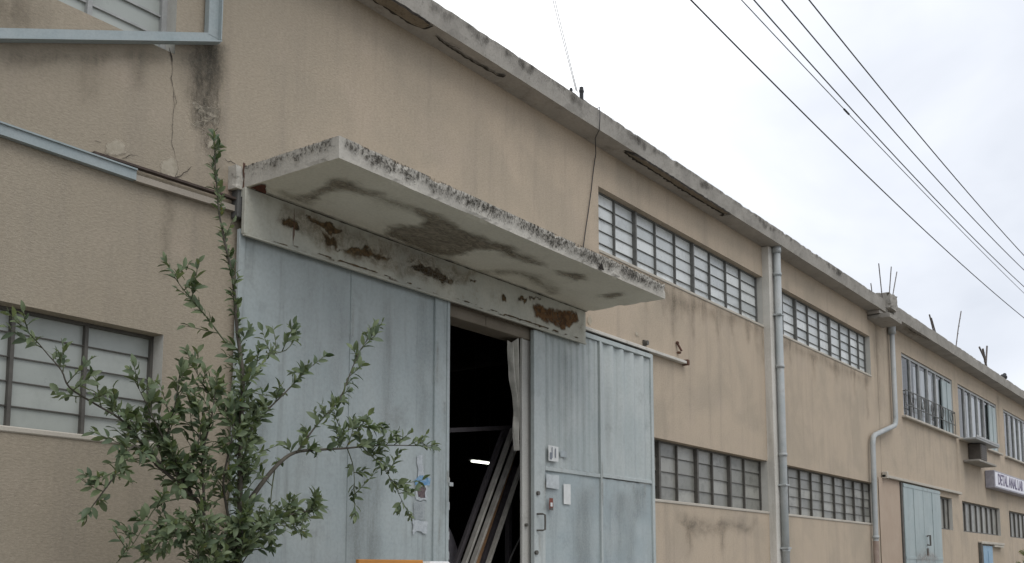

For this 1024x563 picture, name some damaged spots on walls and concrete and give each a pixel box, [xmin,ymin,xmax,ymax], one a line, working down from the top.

crack [169,48,192,178]
water stain [303,181,375,200]
corrosion [273,208,420,289]
corrosion [412,263,453,294]
water stain [390,210,542,284]
corrosion [464,294,579,338]